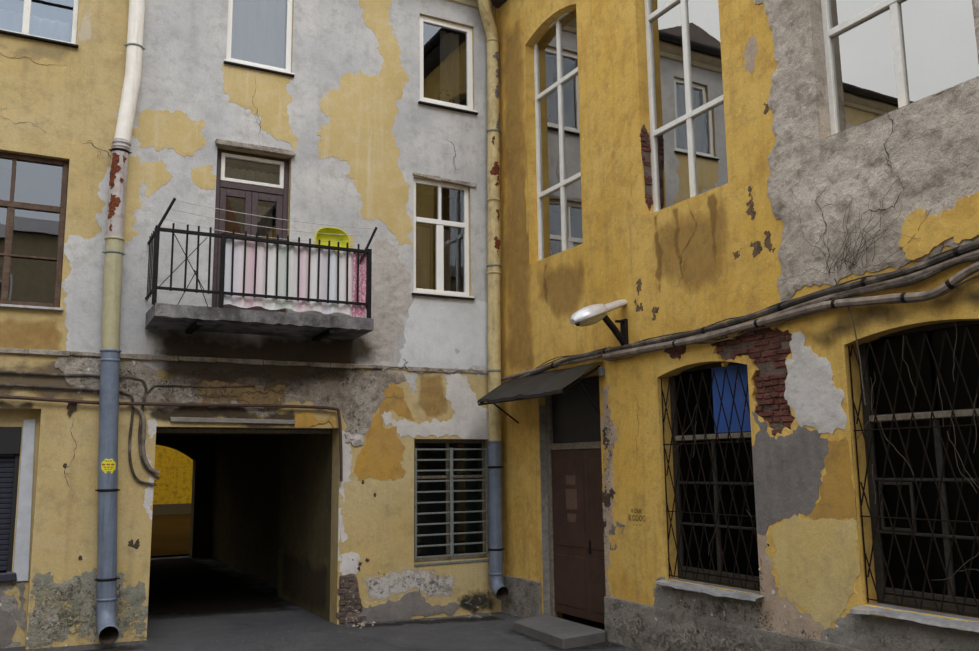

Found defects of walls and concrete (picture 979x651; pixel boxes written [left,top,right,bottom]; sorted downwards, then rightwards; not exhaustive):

flaking render [55,167,110,394]
corrosion [108,153,127,231]
flaking render [119,0,500,624]
flaking render [640,124,653,211]
leakage [654,195,722,289]
spalling [733,0,979,302]
flaking render [713,325,857,520]
peeling [600,385,618,597]
spalling [0,568,100,649]
spalling [116,572,148,641]
spalling [653,533,979,651]